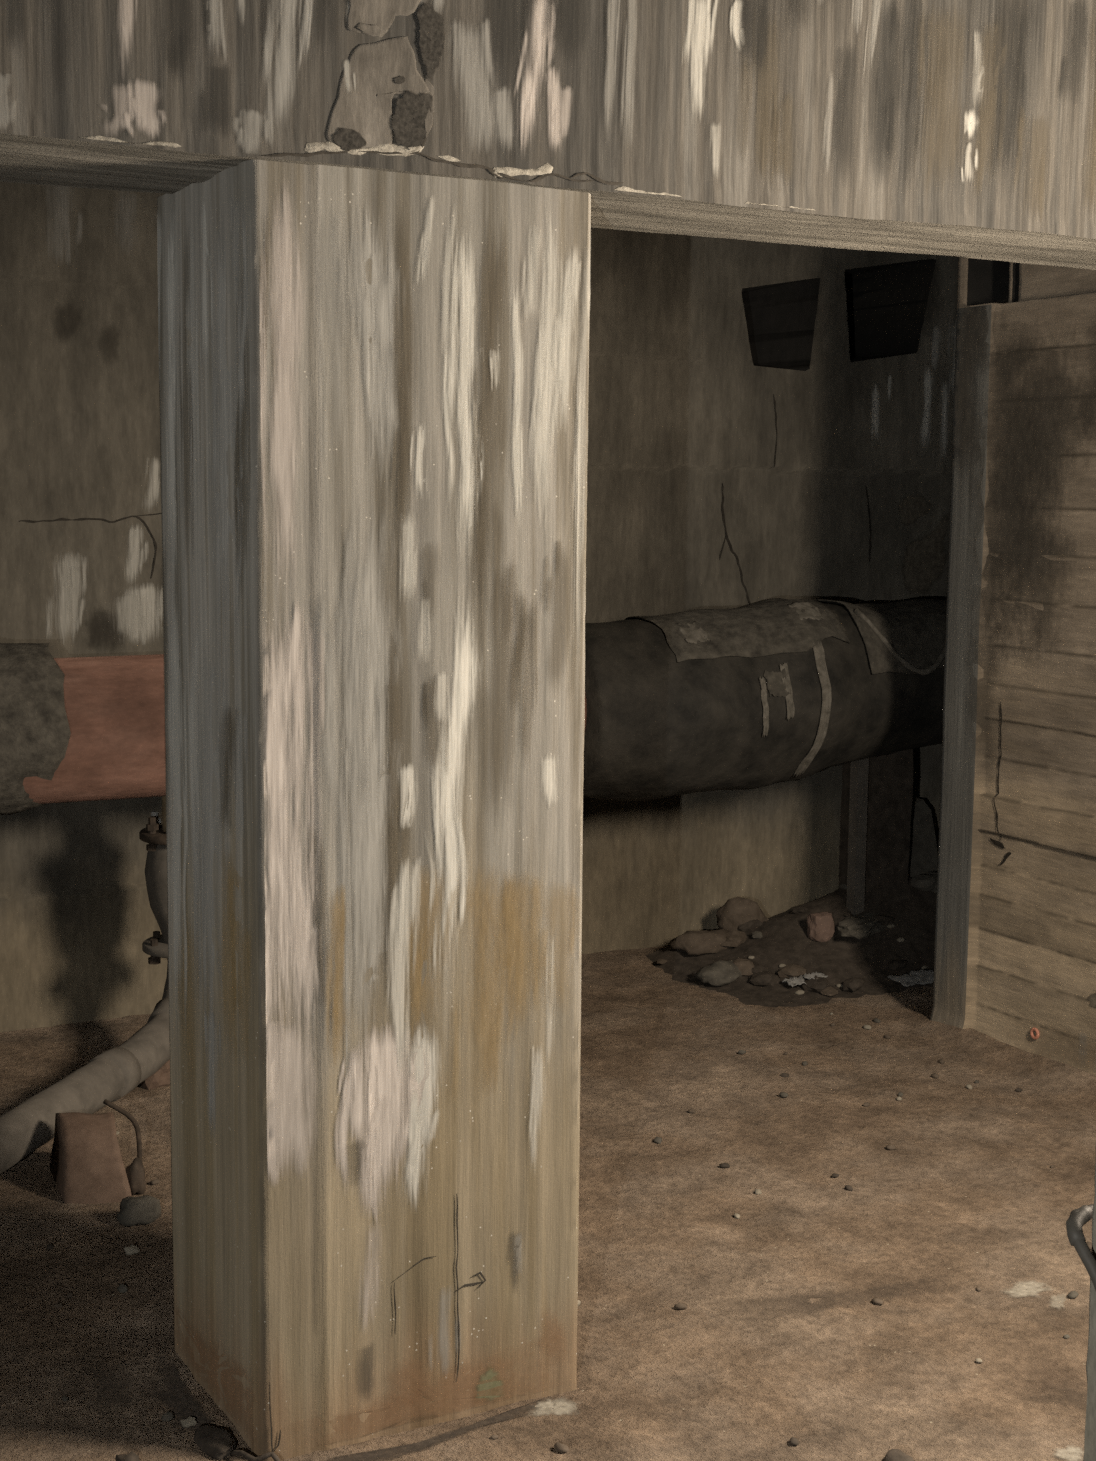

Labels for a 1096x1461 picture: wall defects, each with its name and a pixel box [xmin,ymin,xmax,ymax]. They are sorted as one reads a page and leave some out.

water stain [80,82,181,148]
water stain [213,0,312,149]
peeling [326,0,445,151]
water stain [202,199,302,609]
water stain [348,204,432,586]
water stain [444,243,498,553]
water stain [513,241,577,506]
crack [19,513,161,578]
crack [719,483,751,604]
crack [990,702,1011,865]
water stain [264,535,477,1218]
water stain [333,1398,576,1461]